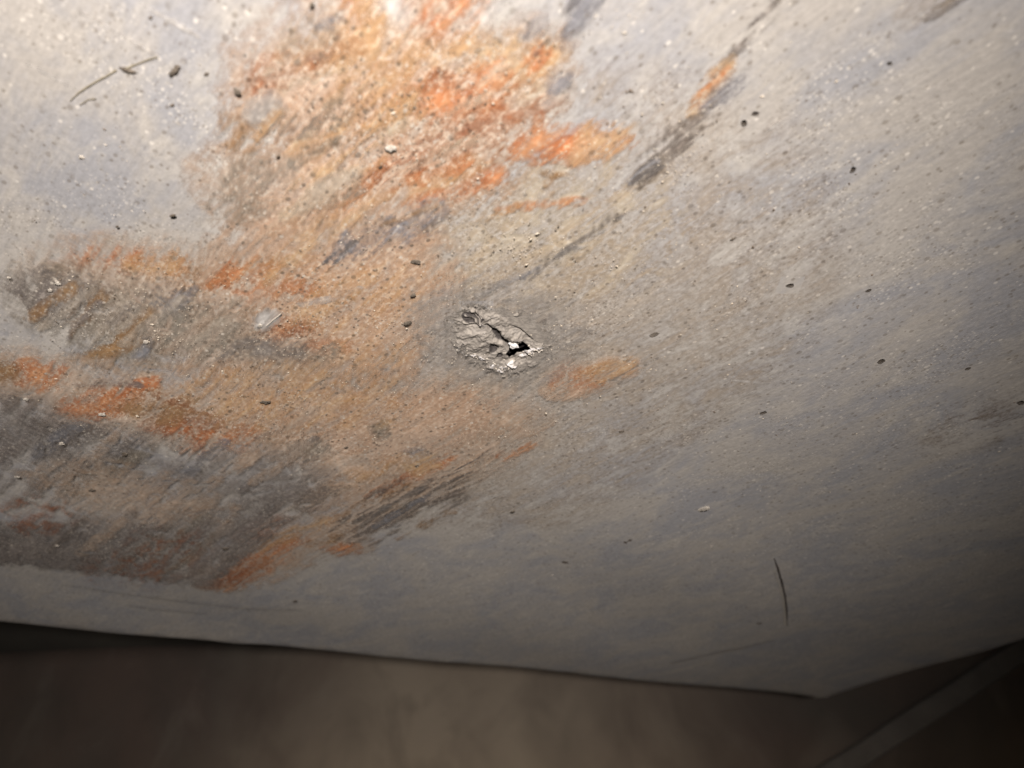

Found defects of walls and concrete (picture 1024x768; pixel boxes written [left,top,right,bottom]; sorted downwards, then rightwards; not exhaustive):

corrosion [0,0,638,591]
water stain [325,230,360,263]
spalling [443,301,560,378]
water stain [338,61,789,537]